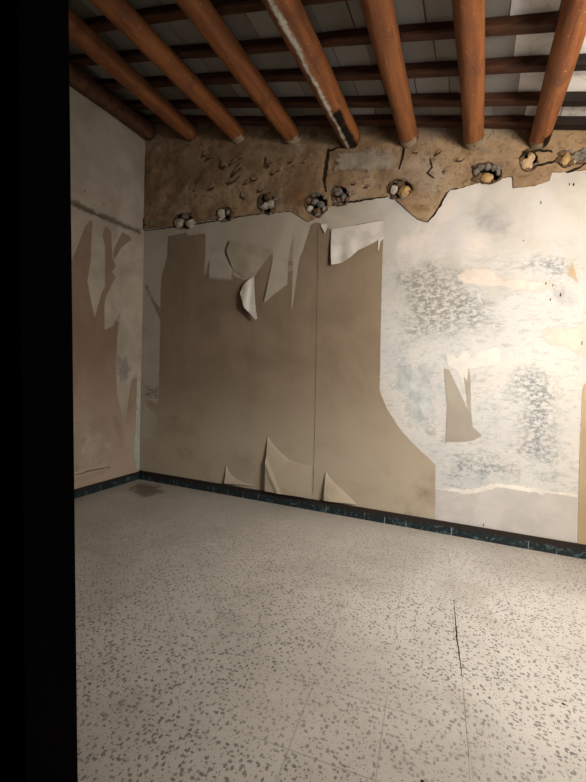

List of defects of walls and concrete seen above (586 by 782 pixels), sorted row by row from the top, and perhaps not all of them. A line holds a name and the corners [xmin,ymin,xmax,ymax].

flaking render [143,123,586,230]
damp [391,358,439,437]
crack [449,599,470,778]